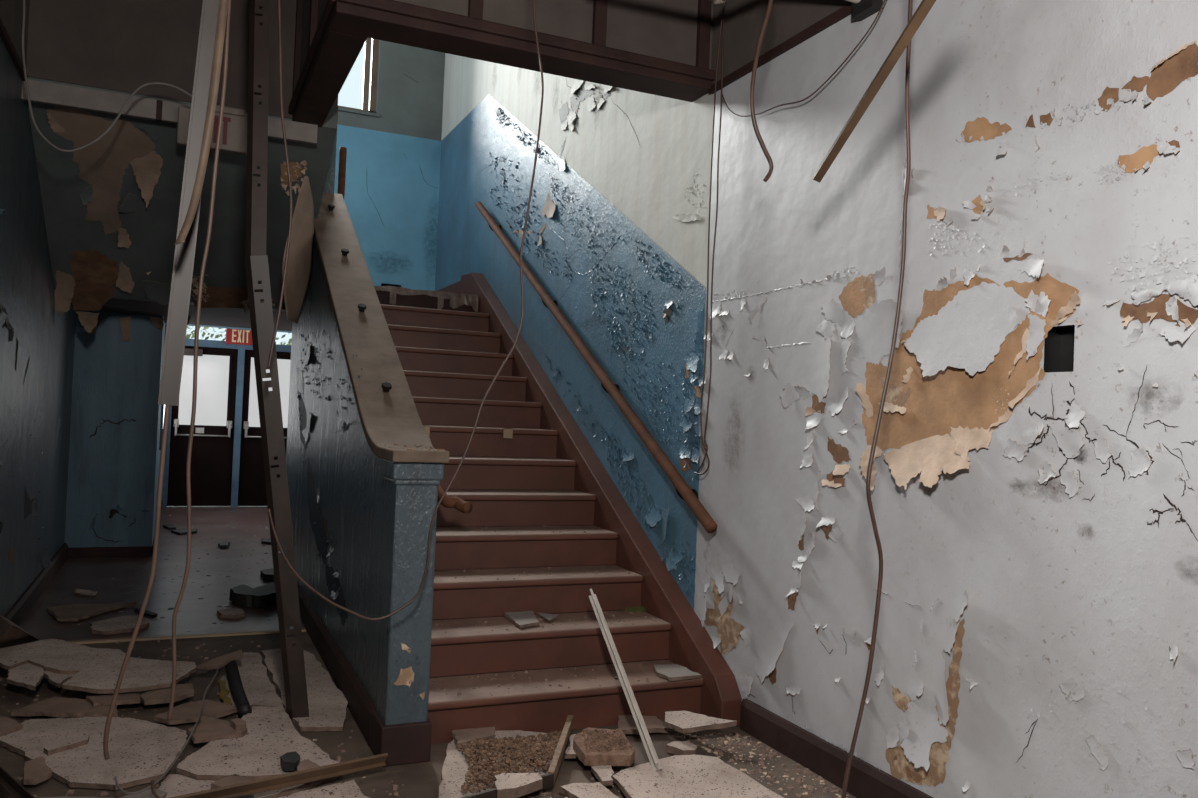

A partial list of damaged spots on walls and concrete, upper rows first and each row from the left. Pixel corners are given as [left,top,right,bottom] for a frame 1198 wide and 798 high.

peeling [953,41,1198,155]
peeling [1094,140,1180,184]
peeling [1,305,30,385]
peeling [481,77,765,487]
peeling [1103,236,1198,347]
peeling [546,170,1083,714]
crack [1003,366,1198,541]
peeling [804,587,978,787]